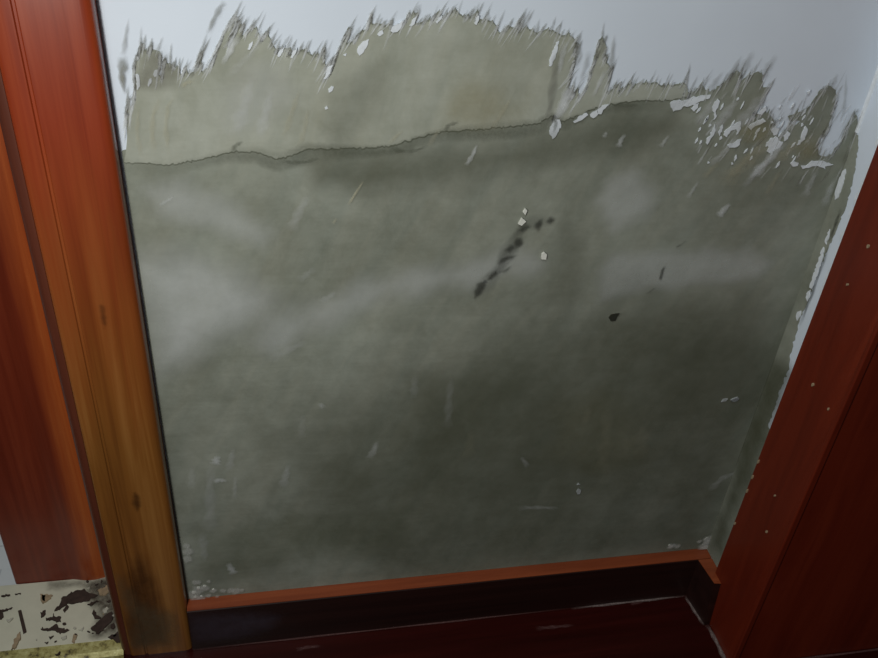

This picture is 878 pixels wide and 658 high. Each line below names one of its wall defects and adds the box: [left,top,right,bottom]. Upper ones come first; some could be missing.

peeling [119,7,859,599]
leakage [738,369,785,484]
peeling [0,593,21,623]
peeling [36,580,120,656]